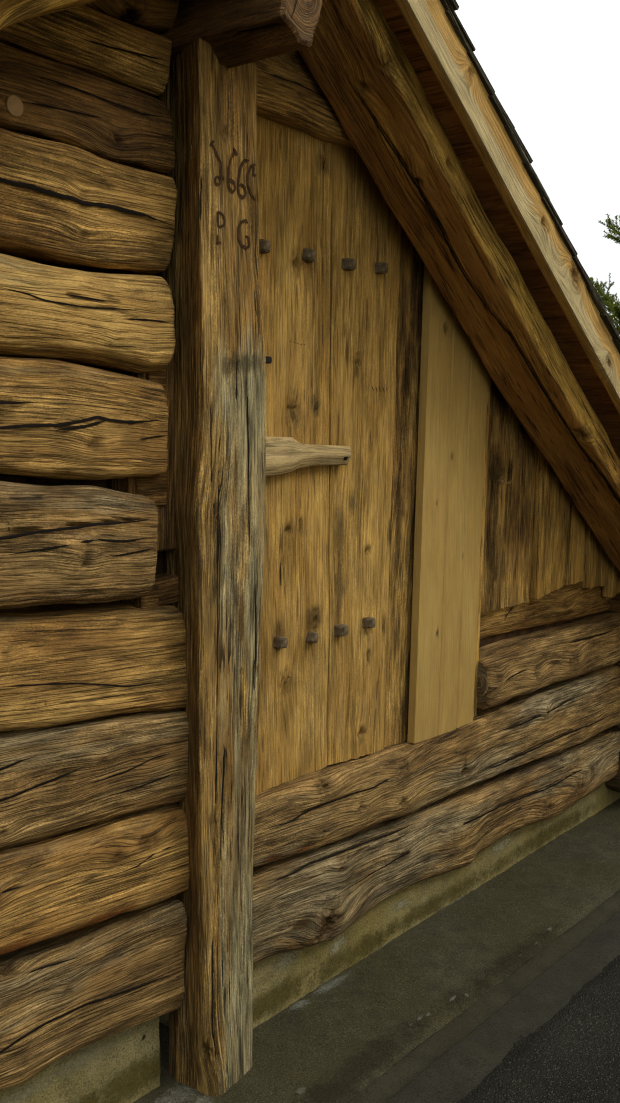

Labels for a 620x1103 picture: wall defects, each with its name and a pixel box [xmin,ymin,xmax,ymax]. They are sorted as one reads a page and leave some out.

crack [0,401,167,440]
crack [0,976,167,1054]